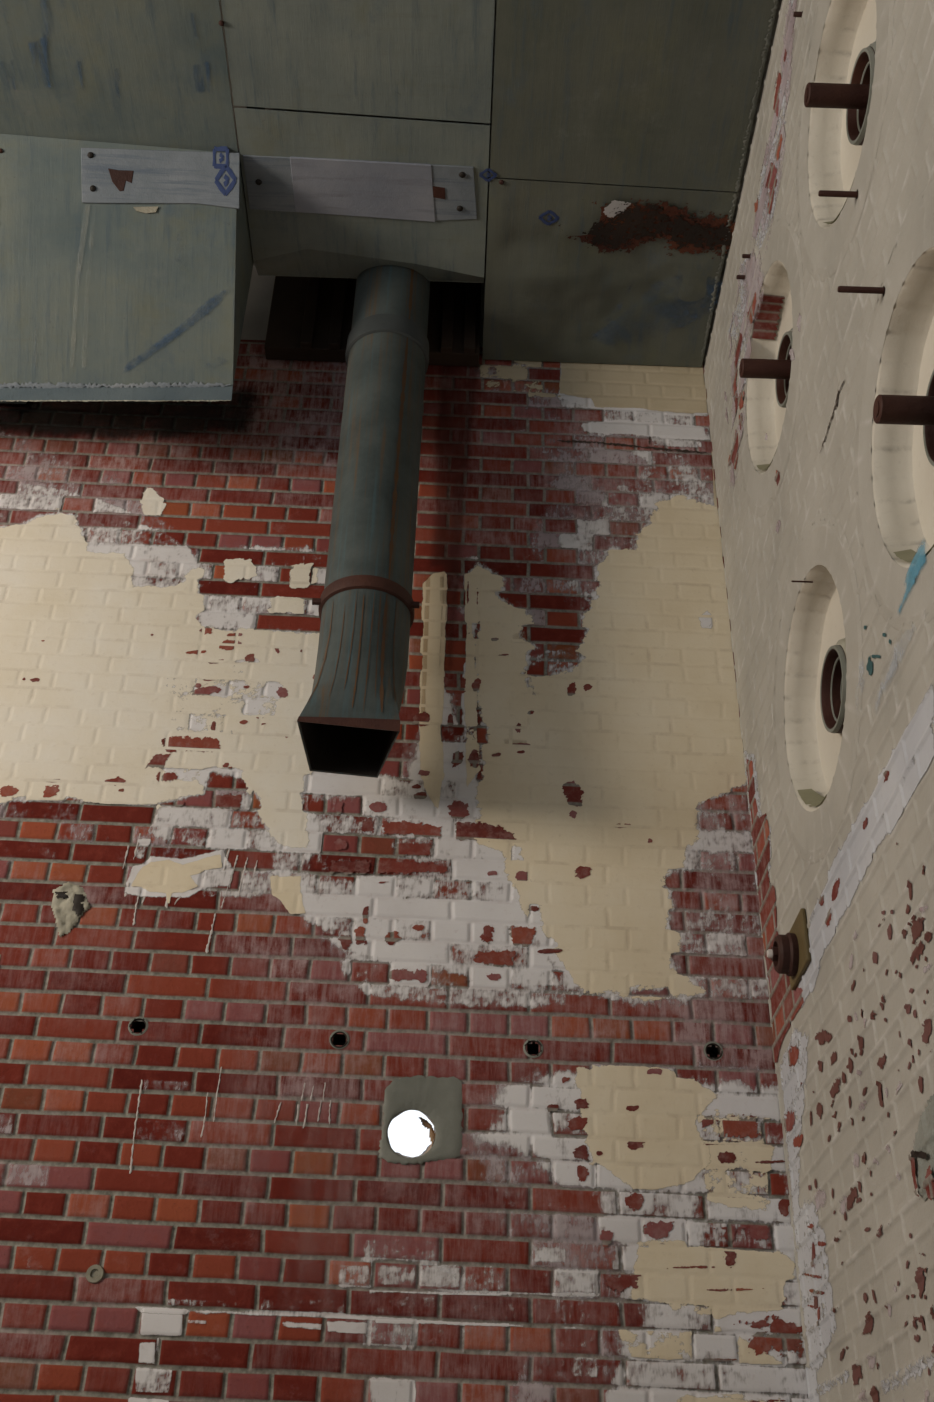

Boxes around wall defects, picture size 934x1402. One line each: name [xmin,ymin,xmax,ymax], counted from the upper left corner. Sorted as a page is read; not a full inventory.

corrosion [559,198,735,259]
peeling [0,361,934,1402]